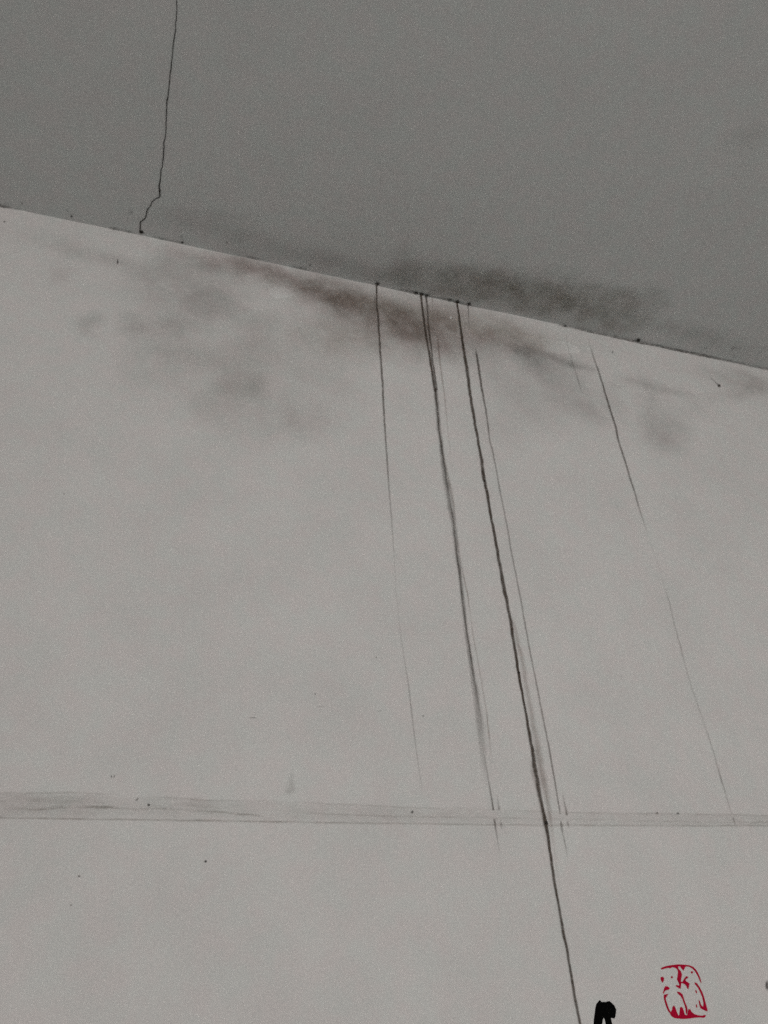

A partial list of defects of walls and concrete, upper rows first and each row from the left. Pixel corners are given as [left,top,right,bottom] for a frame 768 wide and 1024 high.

crack [139,0,177,234]
leakage [376,282,385,421]
leakage [414,292,448,487]
leakage [449,299,581,1024]